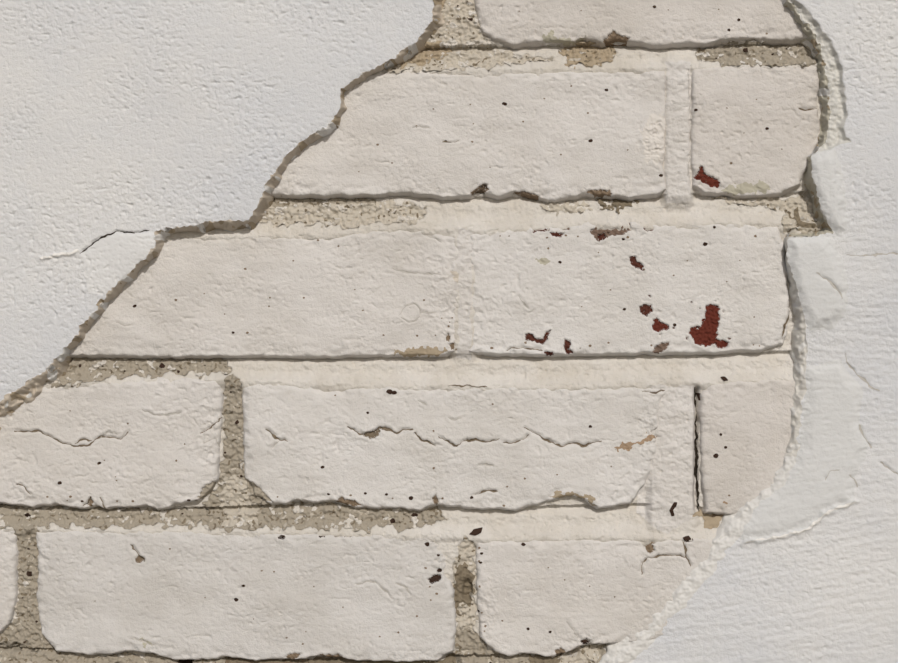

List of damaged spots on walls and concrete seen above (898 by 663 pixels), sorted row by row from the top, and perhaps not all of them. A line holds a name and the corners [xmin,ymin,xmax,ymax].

peeling [335,0,630,117]
spalling [513,191,539,201]
crack [81,230,149,253]
peeling [524,330,554,356]
spalling [555,0,856,663]
crack [142,408,182,416]
crack [14,430,128,447]
crack [347,417,602,466]
crack [669,387,700,516]